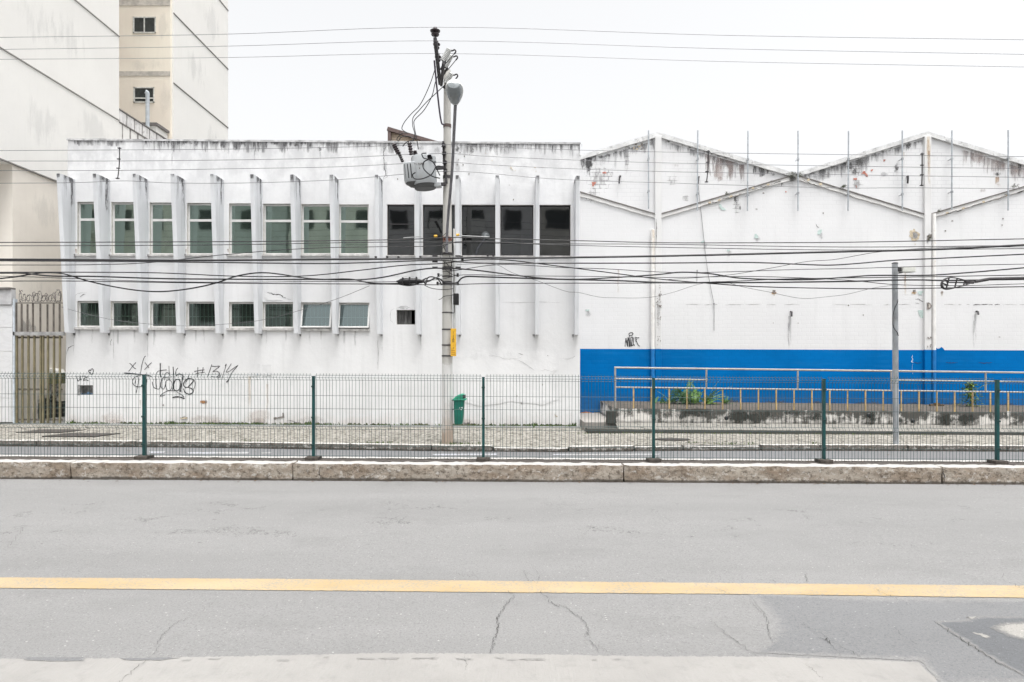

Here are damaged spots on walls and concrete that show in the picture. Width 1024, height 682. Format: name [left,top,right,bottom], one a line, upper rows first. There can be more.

leakage [451,143,516,153]